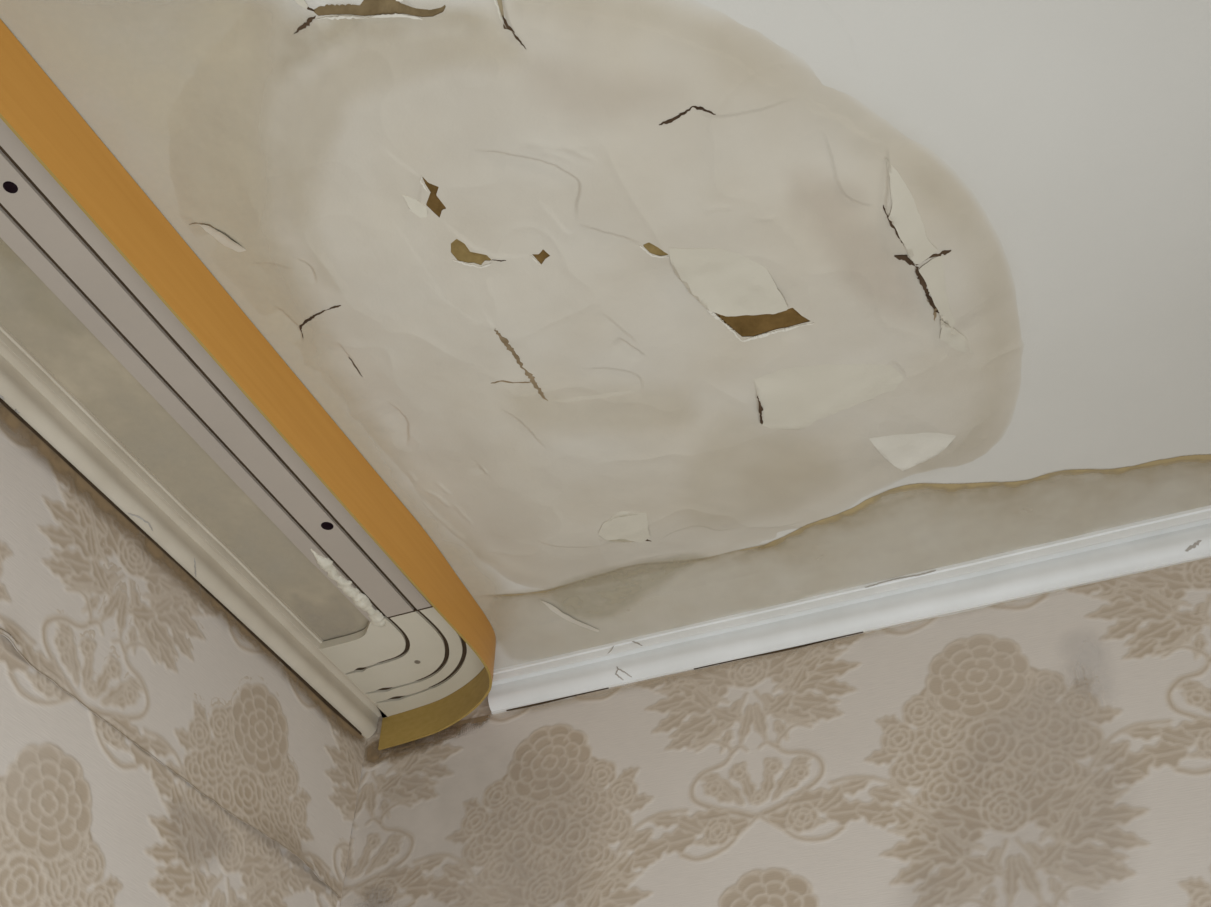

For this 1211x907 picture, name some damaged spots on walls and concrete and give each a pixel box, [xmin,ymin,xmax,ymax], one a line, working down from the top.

damp [0,0,463,564]
crack [883,205,951,321]
crack [491,330,548,401]
damp [733,454,1211,552]
crack [0,398,362,735]
damp [0,403,489,763]
damp [462,582,579,617]